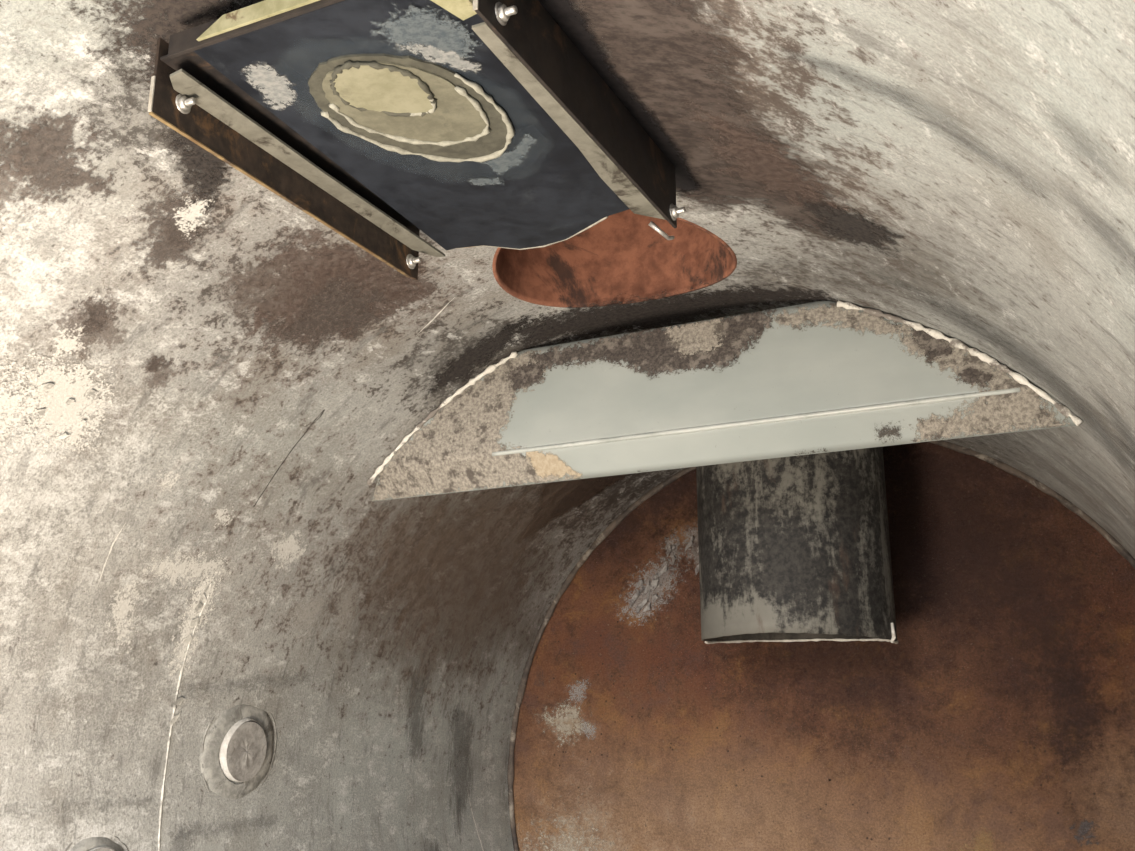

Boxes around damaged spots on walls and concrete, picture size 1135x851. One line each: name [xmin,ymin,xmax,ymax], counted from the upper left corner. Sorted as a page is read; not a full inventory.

peeling [504,361,545,393]
peeling [525,451,583,478]
corrosion [532,474,631,532]